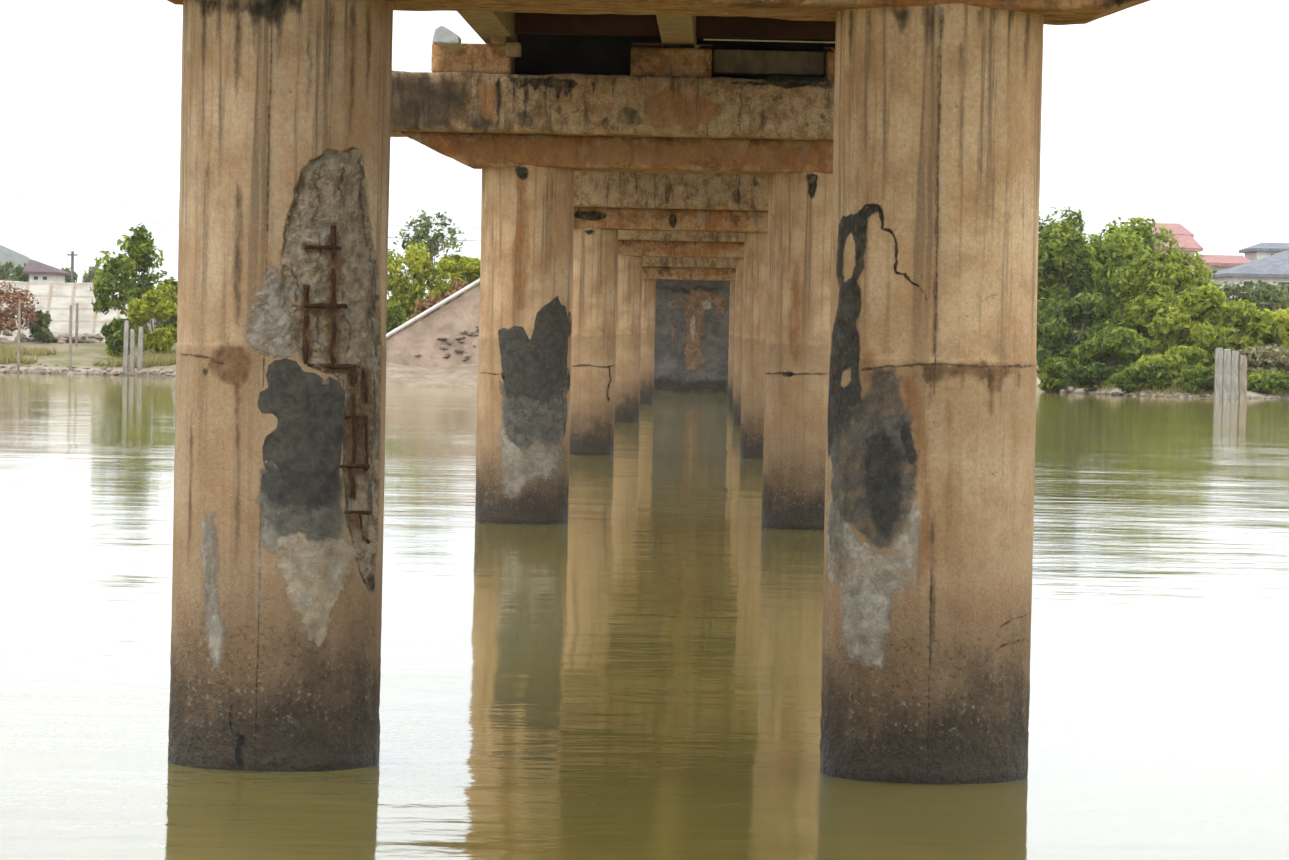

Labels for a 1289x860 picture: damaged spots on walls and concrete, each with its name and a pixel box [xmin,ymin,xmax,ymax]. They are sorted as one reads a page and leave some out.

damp [198,0,301,43]
crack [858,203,927,300]
corrosion [669,286,727,371]
spalling [245,148,382,647]
corrosion [299,223,372,538]
peeling [499,368,570,497]
crack [572,364,615,402]
crack [766,370,825,378]
crack [861,363,1031,383]